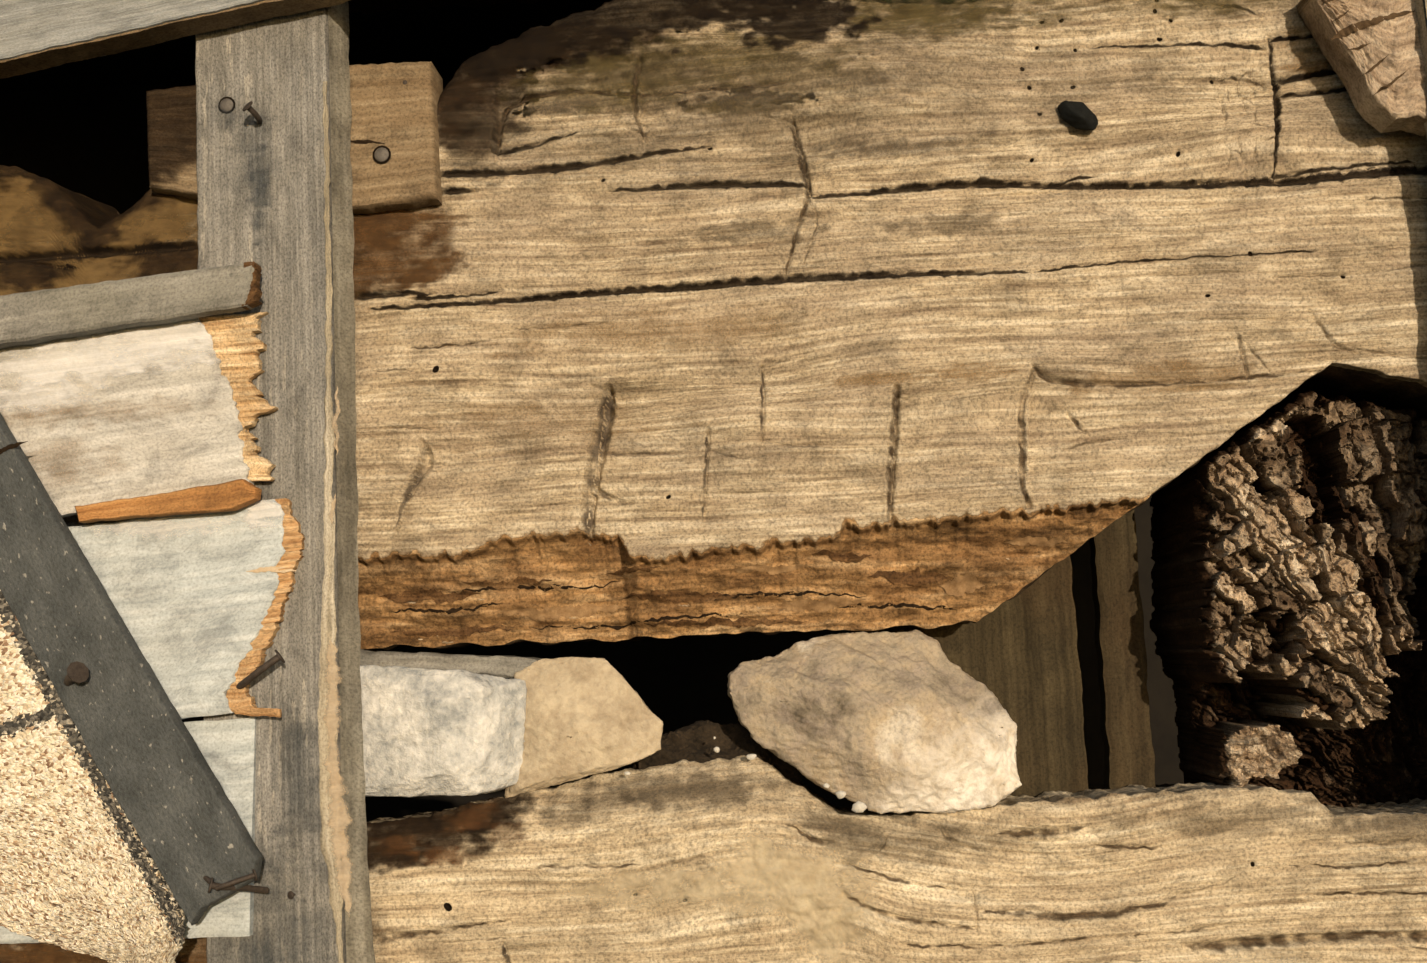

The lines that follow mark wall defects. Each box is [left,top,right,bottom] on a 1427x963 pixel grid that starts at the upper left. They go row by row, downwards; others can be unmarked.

damp [1157,0,1257,15]
damp [437,0,1063,166]
crack [351,138,384,146]
crack [357,0,1427,310]
peeling [0,318,213,407]
crack [758,373,766,428]
crack [1035,364,1305,444]
crack [583,397,613,530]
crack [887,395,898,509]
crack [1018,418,1028,501]
peeling [245,500,283,527]
crack [399,920,510,963]